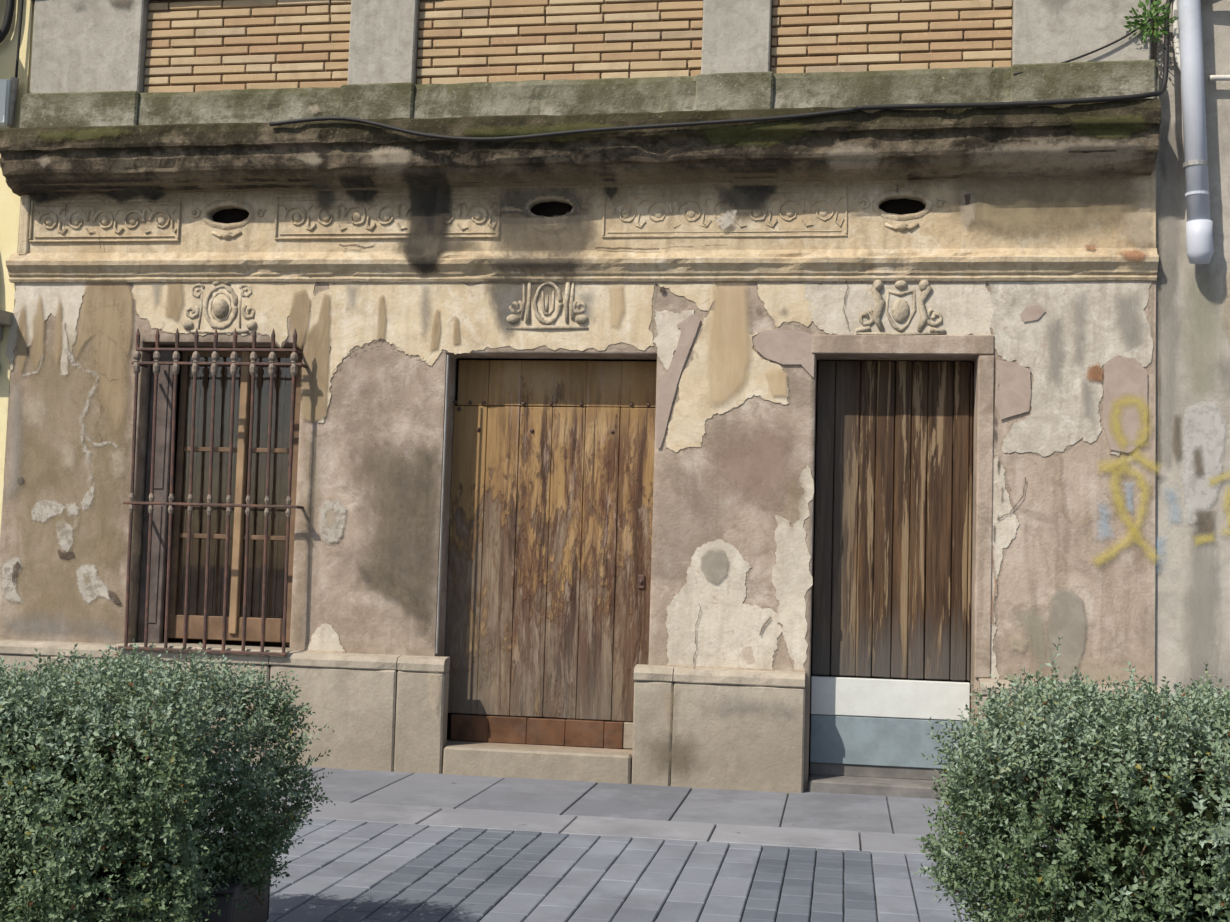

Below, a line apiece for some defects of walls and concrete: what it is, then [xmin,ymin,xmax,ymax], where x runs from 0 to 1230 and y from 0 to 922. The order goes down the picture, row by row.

leakage [399,173,475,275]
peeling [6,282,86,371]
peeling [131,277,1155,680]
flaking render [2,557,22,602]
flaking render [31,484,121,605]
flaking render [1080,660,1142,687]